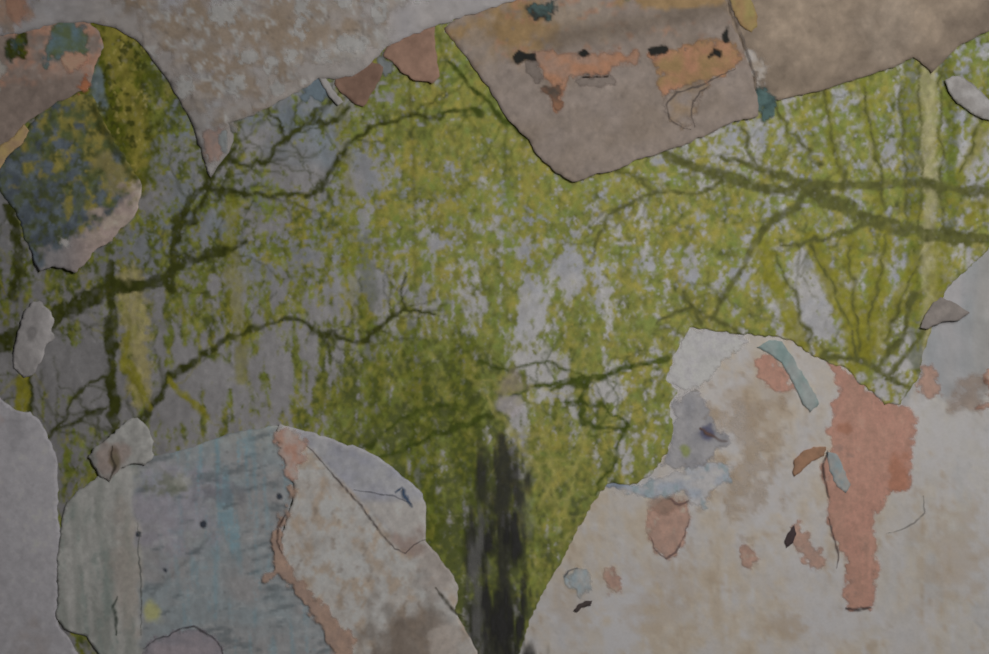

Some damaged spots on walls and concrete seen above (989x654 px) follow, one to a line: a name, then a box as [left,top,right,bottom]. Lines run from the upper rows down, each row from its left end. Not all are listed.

peeling [0,22,142,273]
spalling [111,0,419,175]
peeling [445,0,989,182]
peeling [0,398,478,654]
peeling [564,568,592,612]
peeling [603,567,621,592]
peeling [606,328,819,559]
peeling [740,545,758,568]
peeling [784,520,825,569]
peeling [793,363,917,611]
peeling [915,366,940,398]